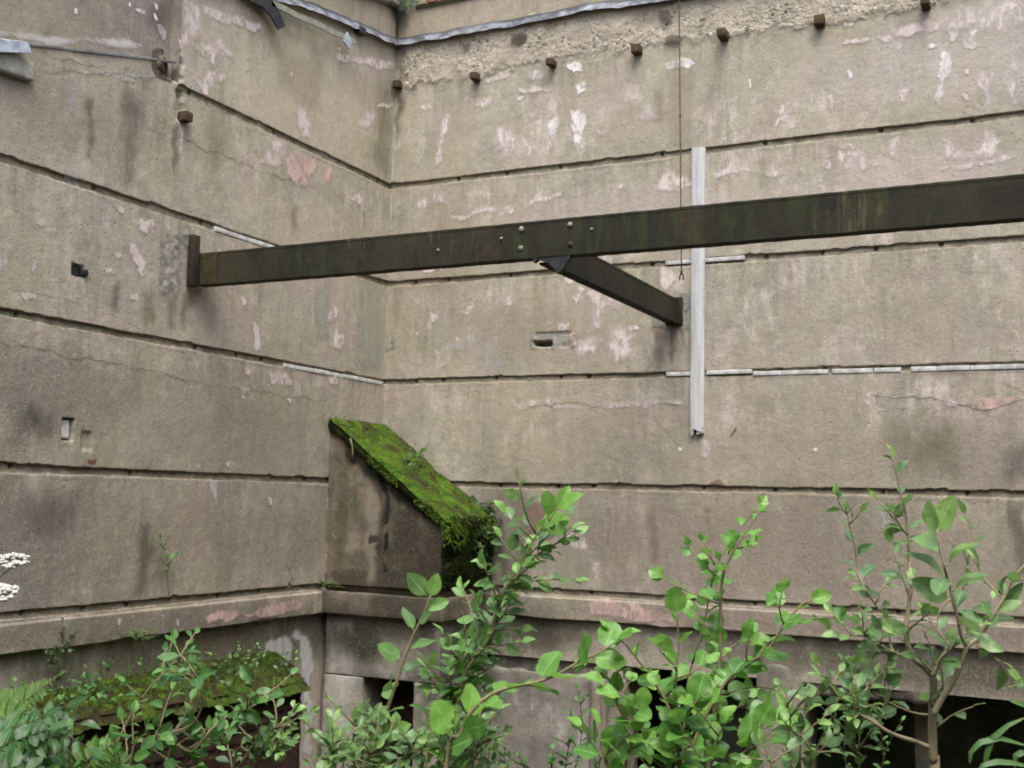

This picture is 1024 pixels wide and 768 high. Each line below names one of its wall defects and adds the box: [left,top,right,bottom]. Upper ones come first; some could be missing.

spalling [335,0,1024,104]
peeling [495,110,587,158]
crack [149,124,396,228]
peeling [261,139,333,186]
peeling [134,219,155,233]
peeling [104,243,146,276]
crack [873,383,1024,411]
peeling [972,397,1014,410]